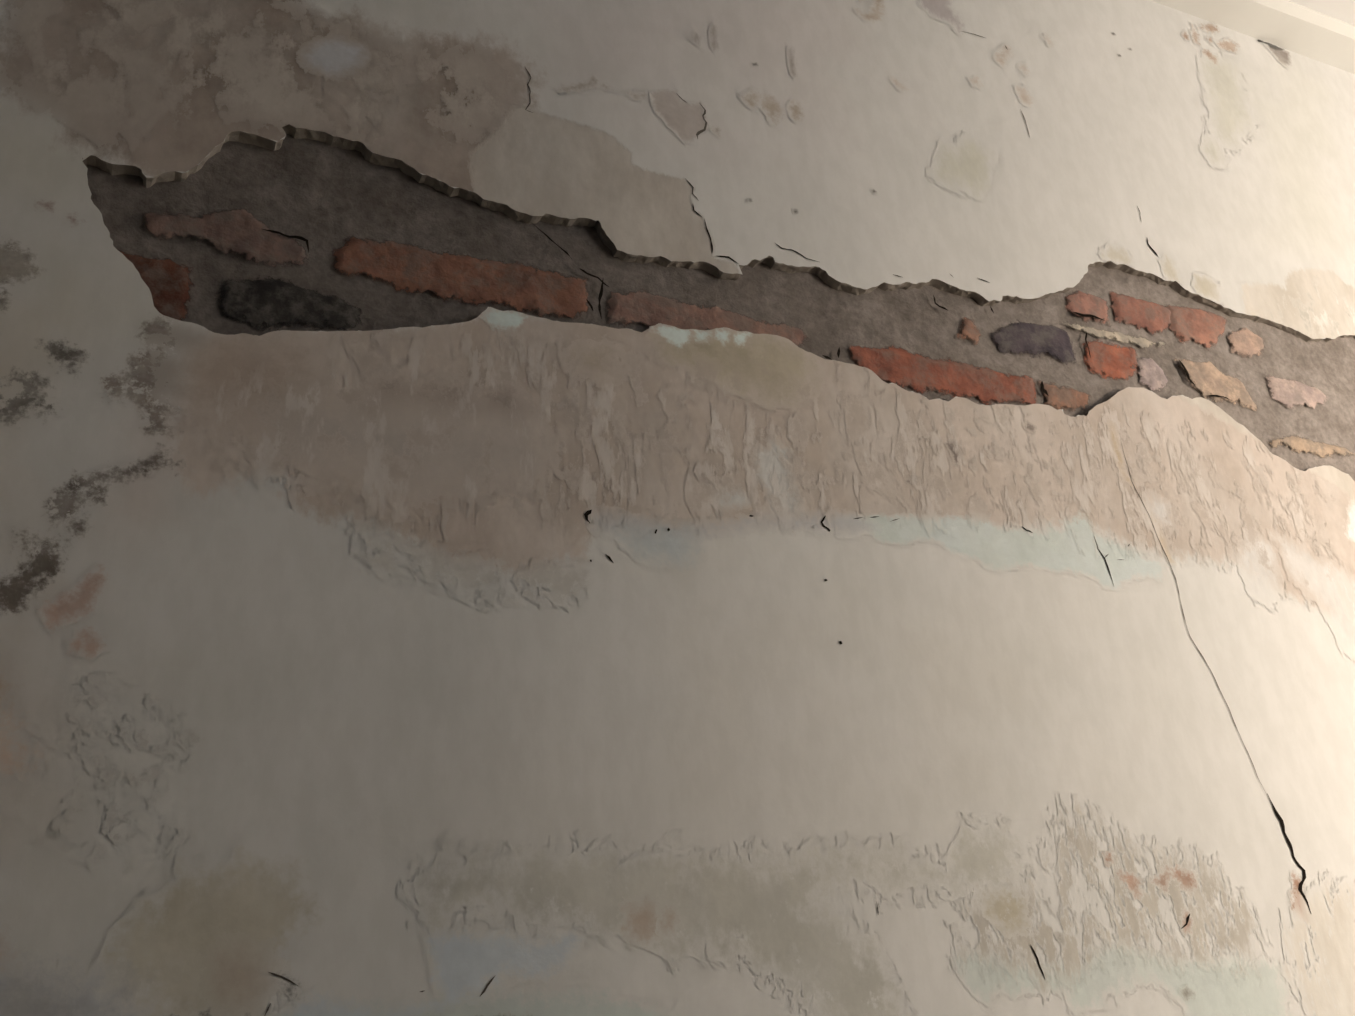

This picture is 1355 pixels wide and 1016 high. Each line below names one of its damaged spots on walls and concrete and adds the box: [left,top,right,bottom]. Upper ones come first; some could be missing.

damp [0,0,527,162]
peeling [648,87,710,144]
damp [0,233,50,315]
flaking render [82,104,1355,504]
damp [0,312,544,619]
damp [345,519,597,619]
damp [687,484,884,544]
crack [1094,443,1311,913]